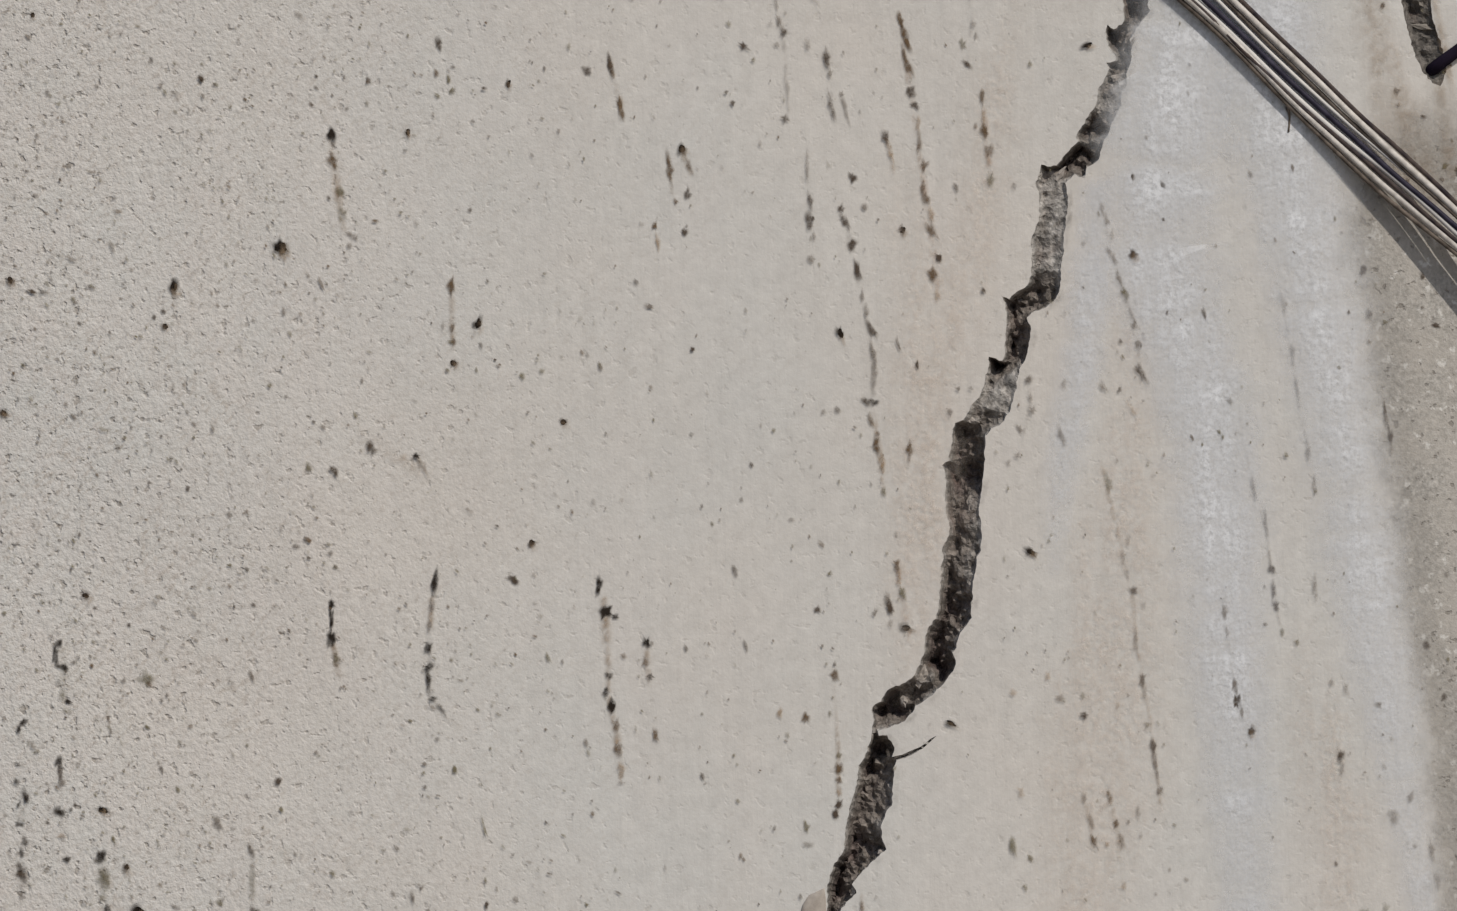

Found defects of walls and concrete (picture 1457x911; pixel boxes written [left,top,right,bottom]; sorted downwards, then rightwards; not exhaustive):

crack [827,0,1150,911]
crack [1401,0,1446,86]